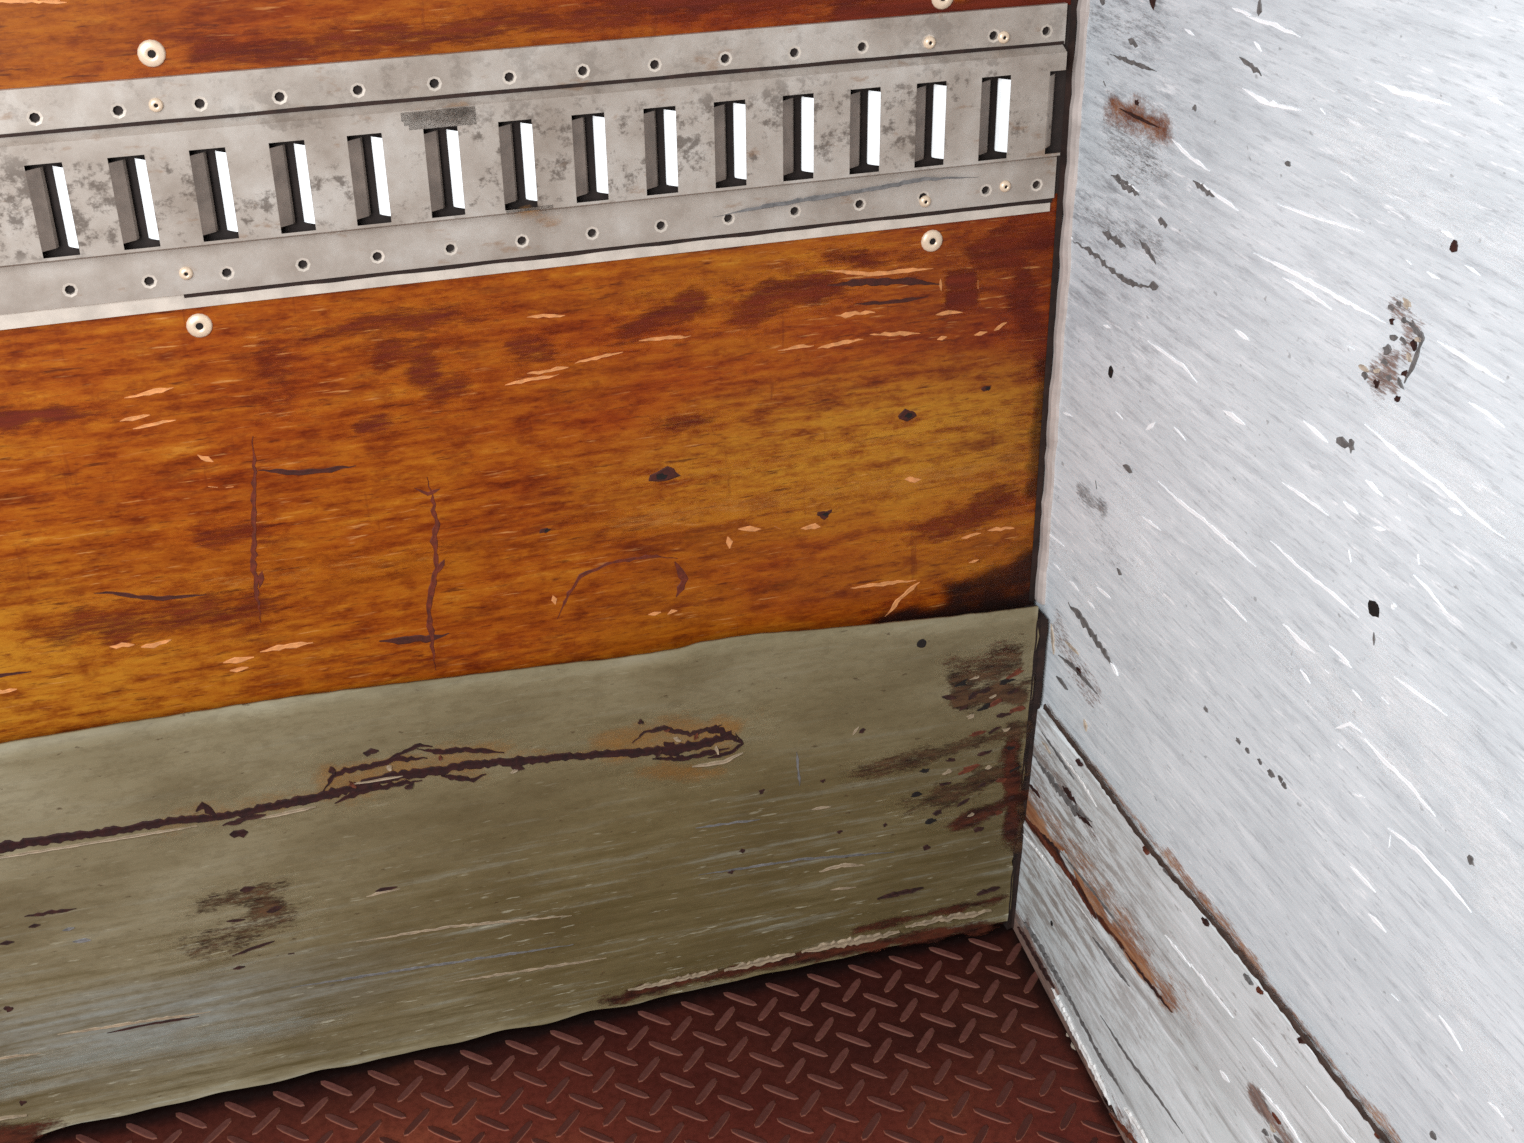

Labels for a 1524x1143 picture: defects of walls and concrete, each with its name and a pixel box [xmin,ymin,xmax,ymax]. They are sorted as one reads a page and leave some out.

corrosion [1105,98,1170,156]
peeling [1358,297,1425,402]
crack [379,478,449,670]
crack [0,719,744,859]
peeling [1247,1084,1293,1143]